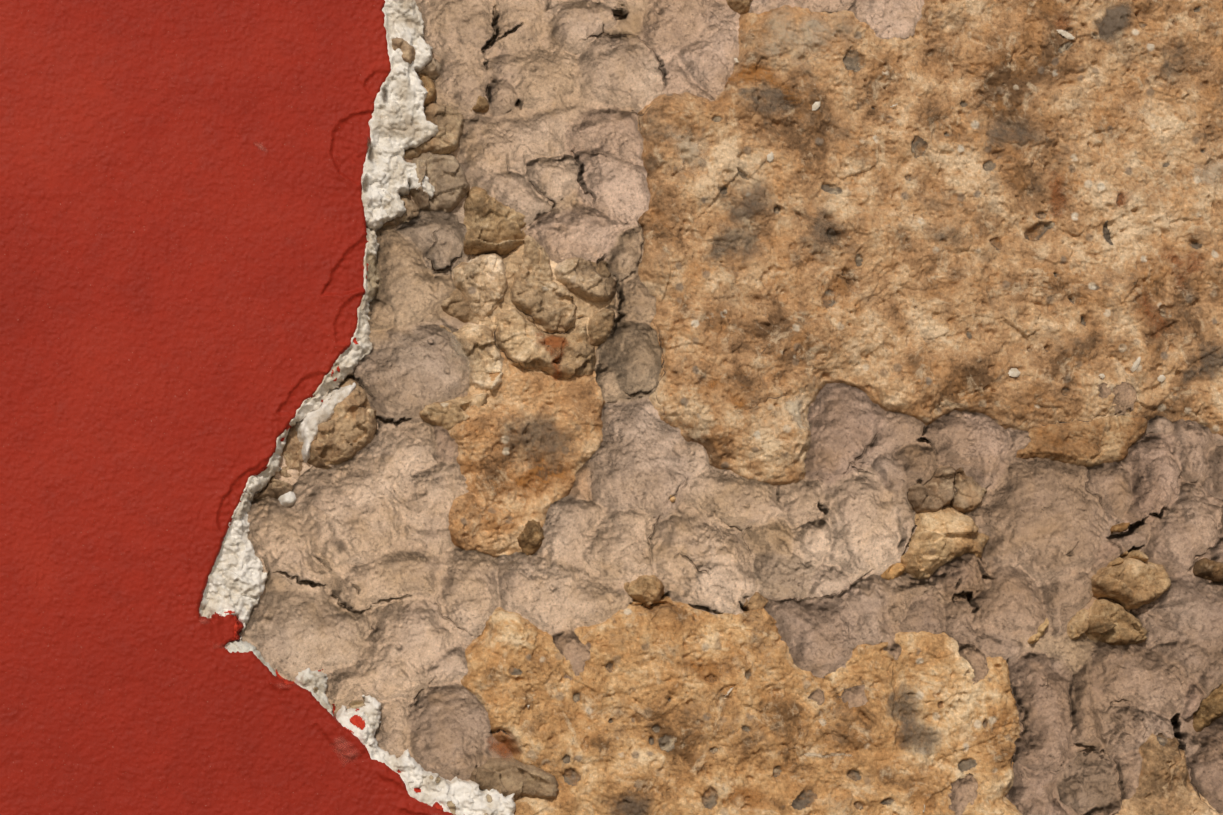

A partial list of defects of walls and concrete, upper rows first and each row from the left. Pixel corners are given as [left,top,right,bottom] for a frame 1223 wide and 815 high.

spalling [843,48,866,72]
spalling [912,136,928,158]
spalling [821,184,843,195]
spalling [1024,212,1055,241]
spalling [1103,220,1113,245]
spalling [199,0,516,815]
crack [1085,476,1165,558]
spalling [562,754,581,786]
spalling [847,770,861,781]
spalling [958,758,977,772]
spalling [702,786,718,810]
spalling [791,790,818,810]